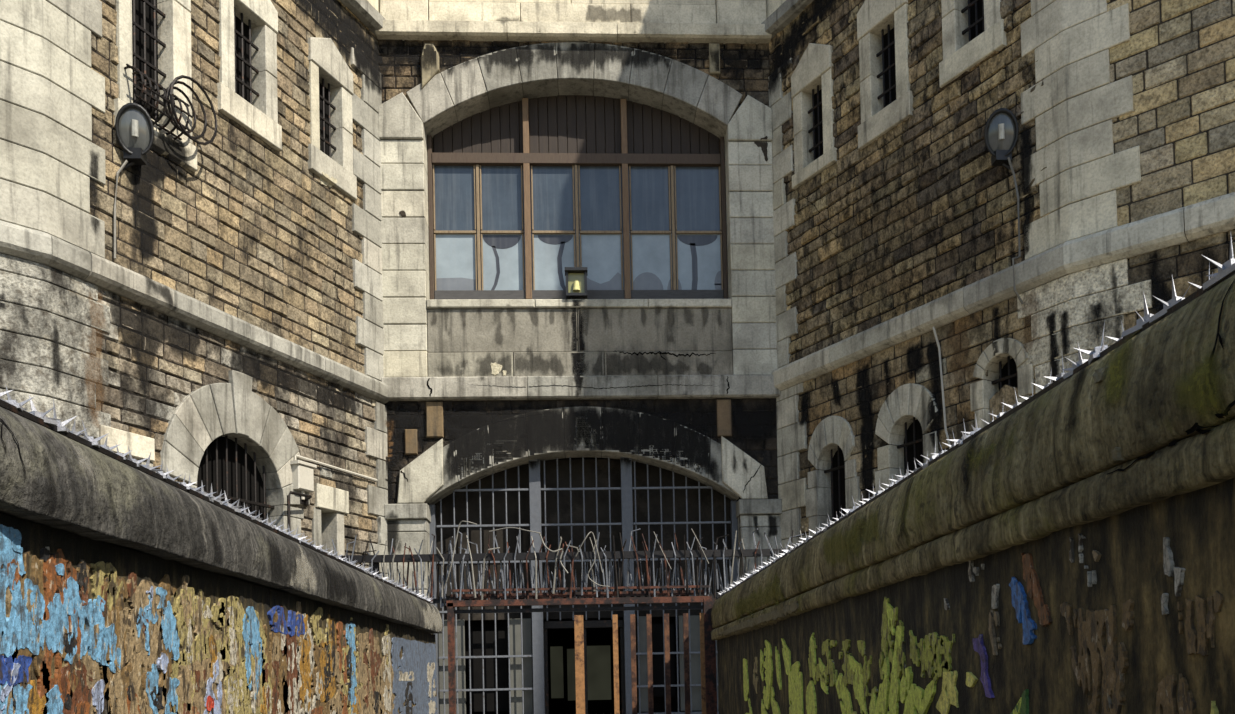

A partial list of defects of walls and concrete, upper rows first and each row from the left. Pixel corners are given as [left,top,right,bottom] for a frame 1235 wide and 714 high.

water stain [572,300,585,396]
water stain [1046,311,1069,383]
water stain [1091,269,1122,342]
water stain [1149,255,1172,313]
crack [1209,279,1235,362]
water stain [856,358,891,502]
water stain [906,343,944,450]
crack [1107,400,1235,475]
water stain [753,516,777,536]
peeling [1069,534,1102,587]
peeling [1161,537,1235,656]
peeling [1156,673,1219,714]